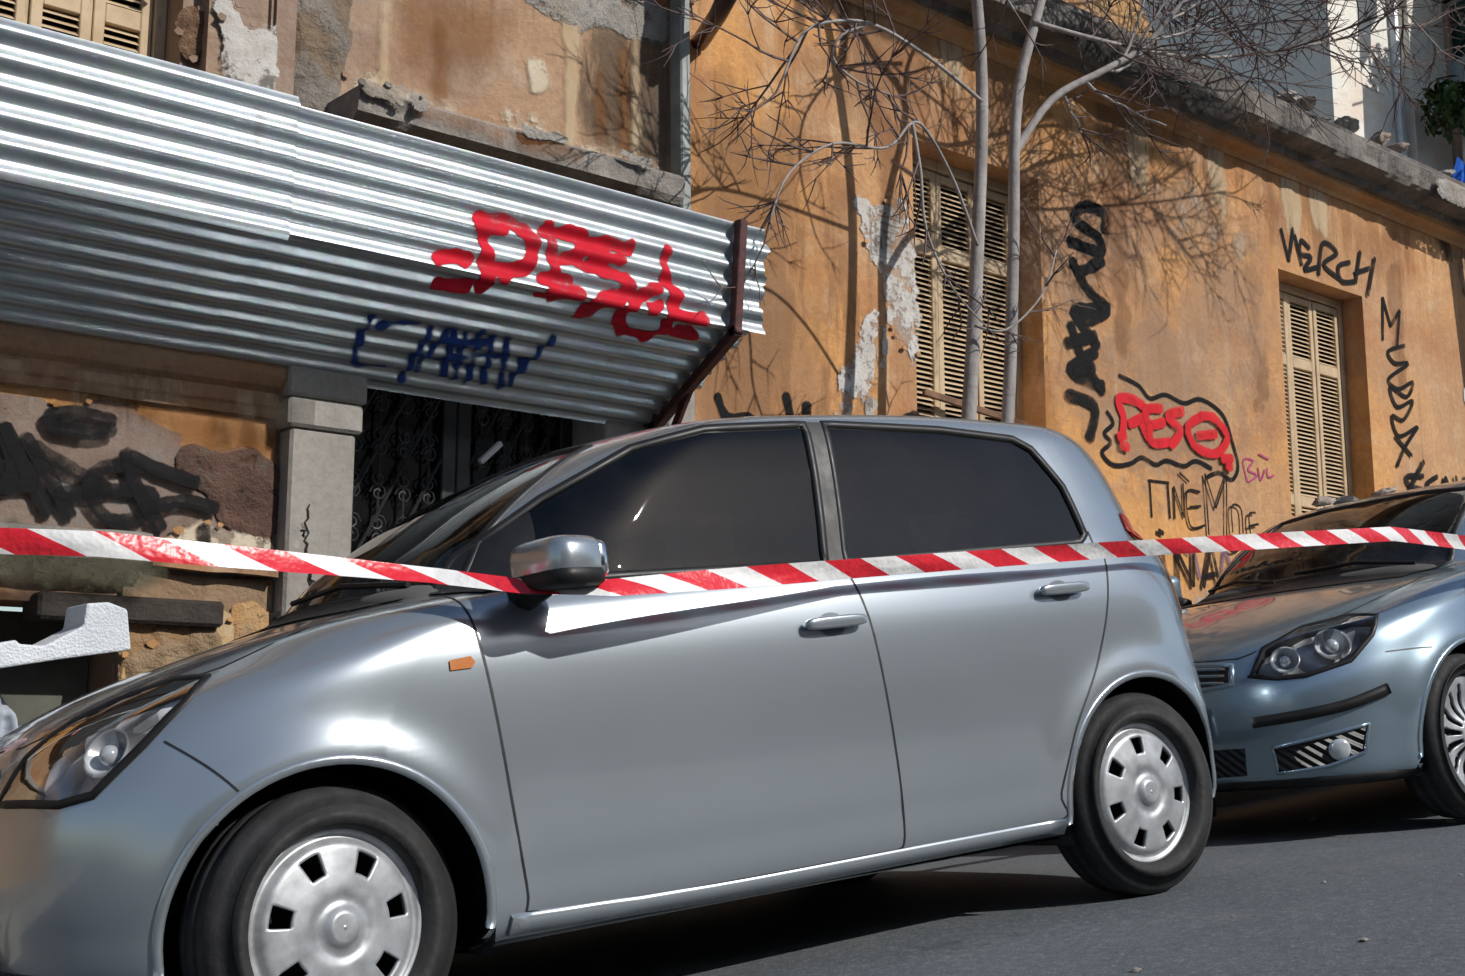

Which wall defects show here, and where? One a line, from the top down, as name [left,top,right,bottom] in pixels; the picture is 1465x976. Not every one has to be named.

flaking render [174,0,430,113]
flaking render [835,195,922,415]
flaking render [167,444,280,550]
crack [300,504,315,585]
flaking render [118,611,235,681]